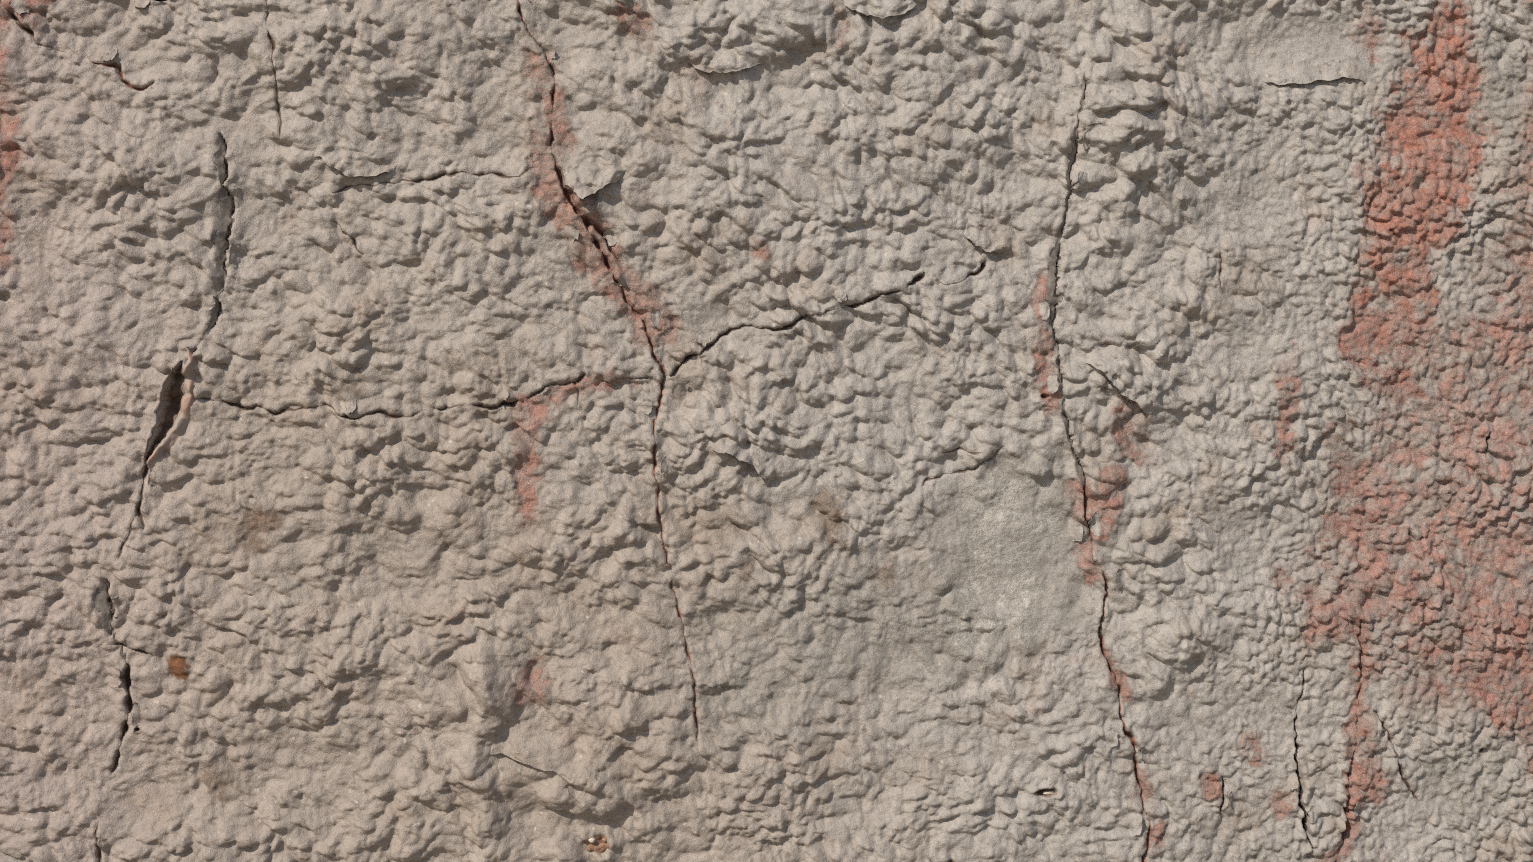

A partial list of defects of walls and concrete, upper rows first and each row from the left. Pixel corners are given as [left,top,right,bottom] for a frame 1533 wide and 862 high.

crack [0,0,155,91]
crack [133,0,166,8]
crack [184,134,245,363]
crack [196,0,985,742]
crack [922,447,1002,486]
crack [1039,73,1153,862]
peeling [1270,0,1533,862]
crack [93,458,156,771]
crack [1220,779,1234,812]
crack [1287,615,1419,862]